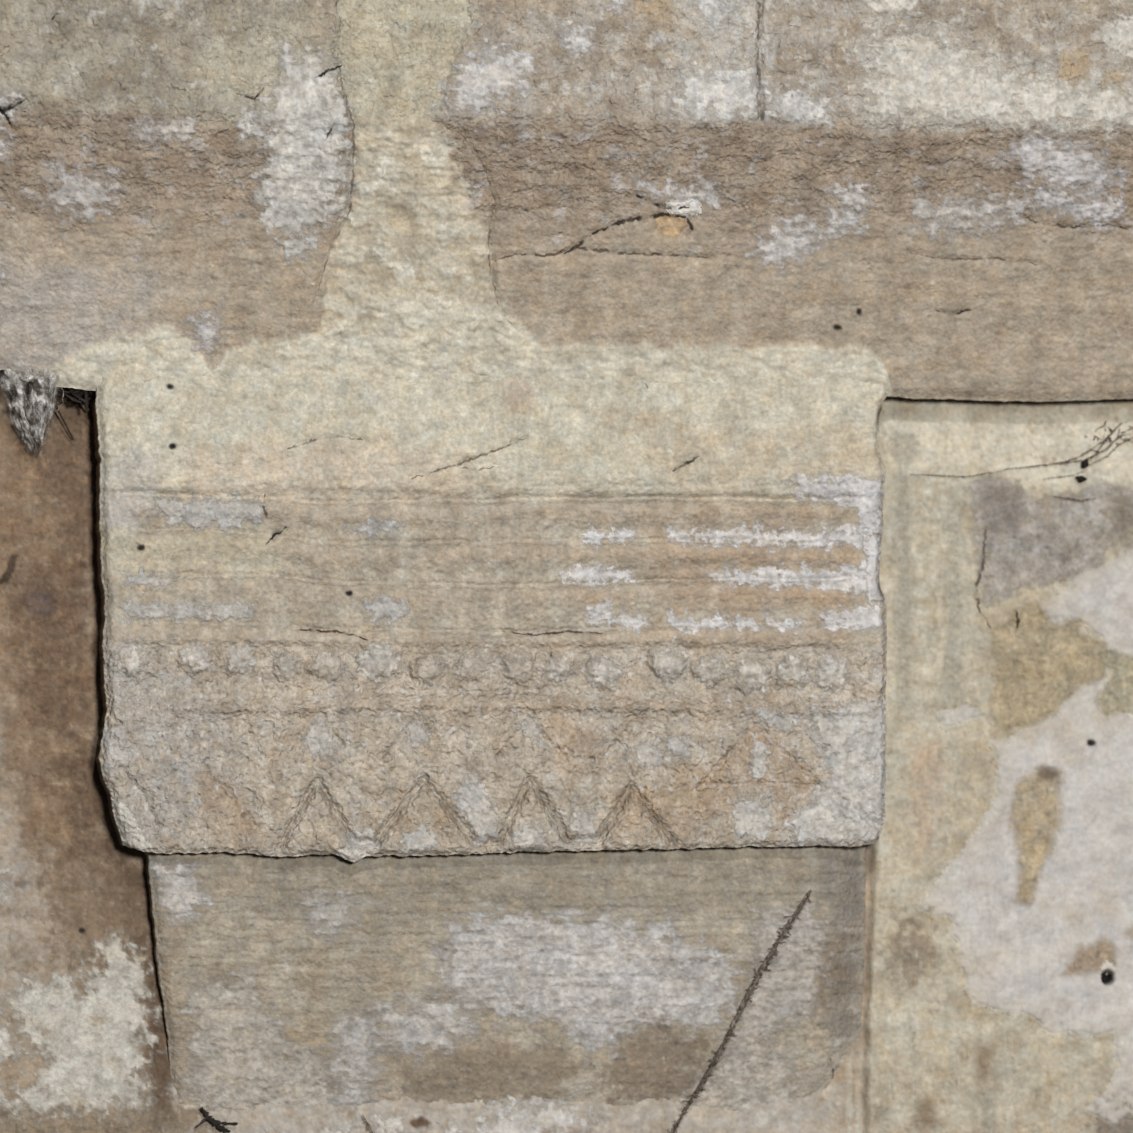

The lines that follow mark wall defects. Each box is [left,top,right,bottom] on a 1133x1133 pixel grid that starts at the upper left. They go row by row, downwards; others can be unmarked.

crack [454,130,707,323]
water stain [149,491,268,532]
water stain [120,567,260,624]
crack [975,529,991,628]
water stain [0,397,205,1133]